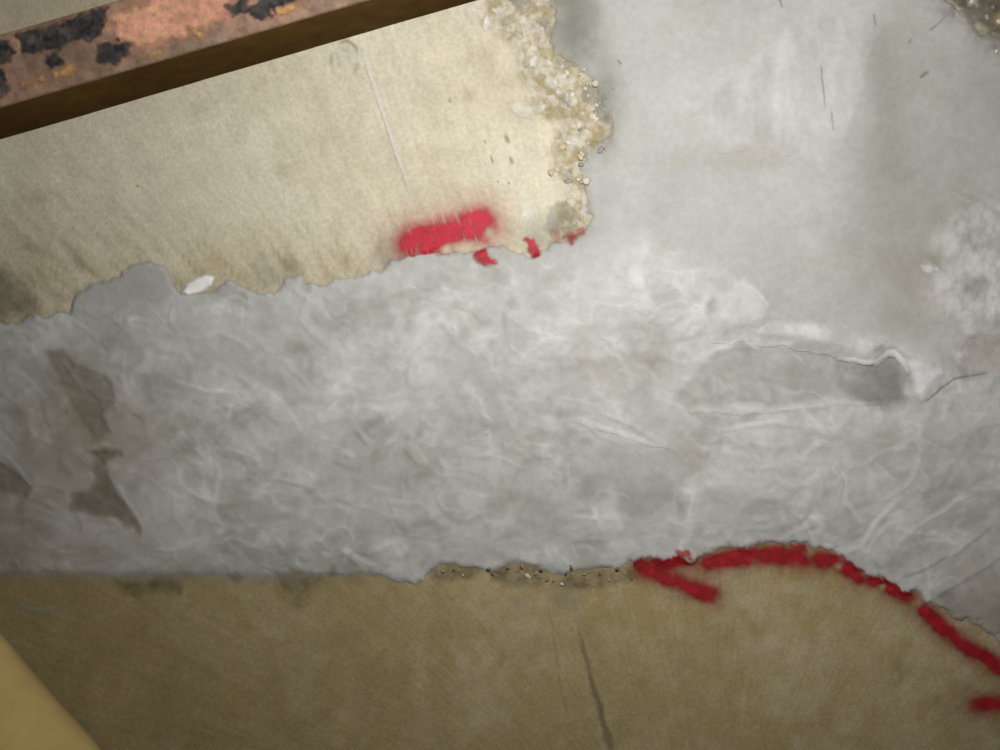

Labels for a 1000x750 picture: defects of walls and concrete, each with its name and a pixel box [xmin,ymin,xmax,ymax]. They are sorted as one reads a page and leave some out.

peeling [224,0,295,21]
spalling [962,0,1000,29]
peeling [0,7,131,98]
spalling [467,0,609,236]
spalling [182,275,214,295]